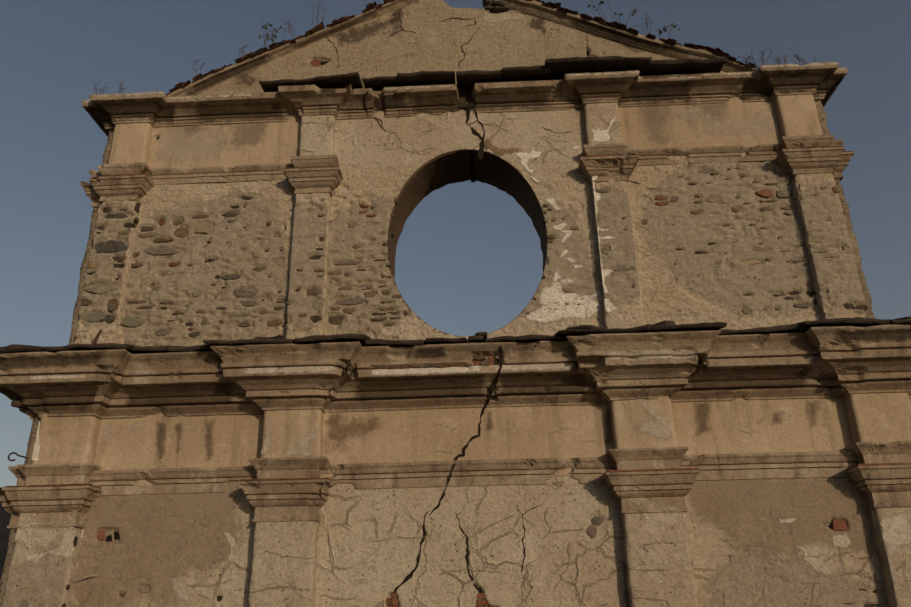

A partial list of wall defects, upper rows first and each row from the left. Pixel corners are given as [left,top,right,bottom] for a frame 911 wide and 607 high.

crack [387,0,481,67]
crack [347,87,500,182]
spalling [522,161,868,316]
crack [251,346,669,607]
crack [72,525,233,607]
spalling [386,592,400,607]
spalling [473,582,498,607]
crack [692,497,873,607]